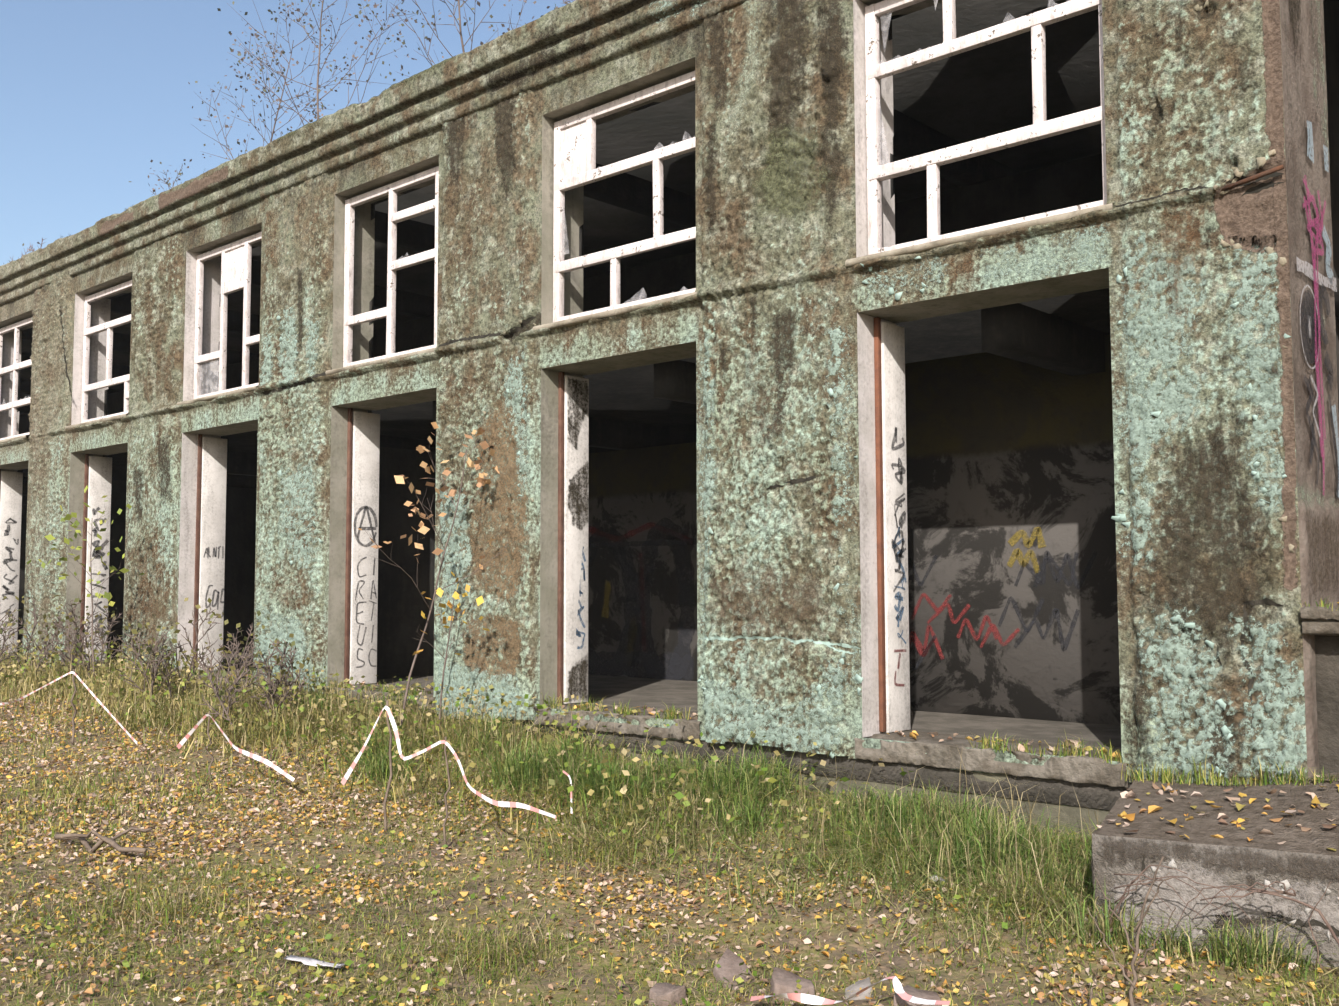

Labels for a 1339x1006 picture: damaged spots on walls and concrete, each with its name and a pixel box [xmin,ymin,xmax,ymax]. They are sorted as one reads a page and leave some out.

damp [704,0,849,234]
spalling [435,312,541,719]
damp [1142,417,1273,688]